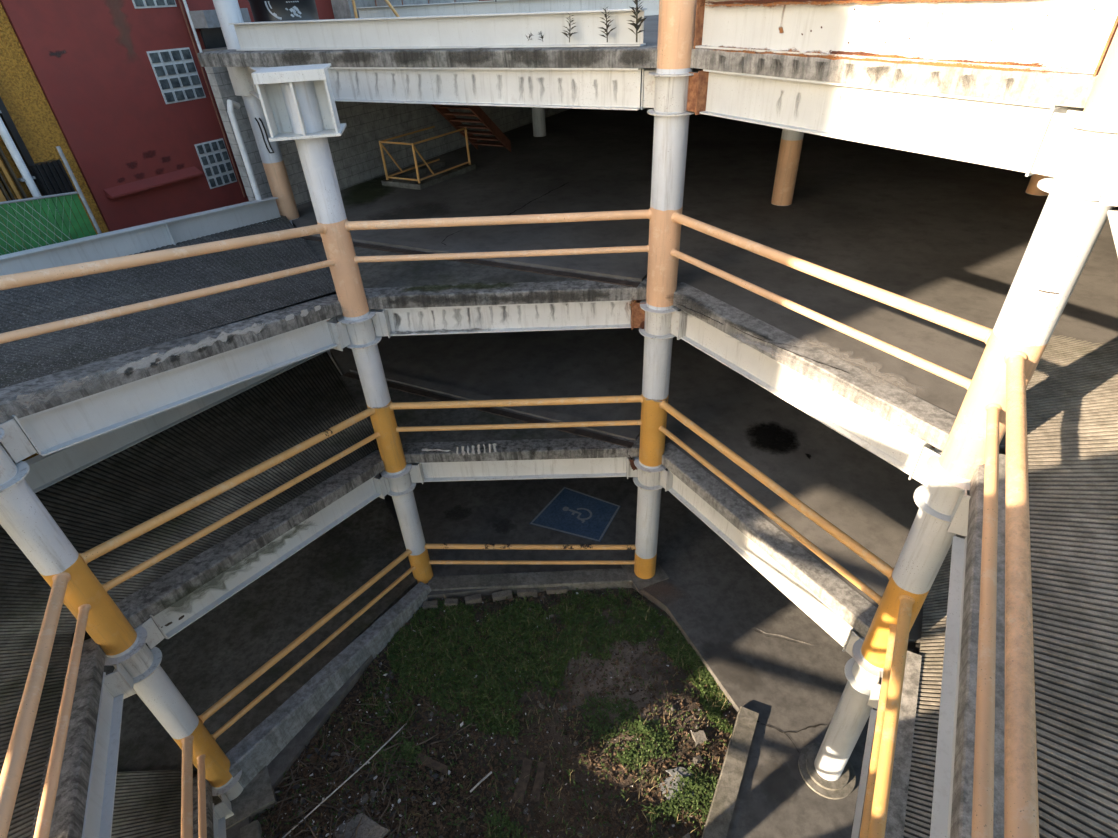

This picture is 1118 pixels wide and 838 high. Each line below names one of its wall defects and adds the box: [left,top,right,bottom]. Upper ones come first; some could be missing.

corrosion [702,0,1017,10]
water stain [283,50,309,65]
water stain [335,50,373,74]
water stain [394,50,427,63]
water stain [450,48,492,77]
water stain [513,49,546,82]
water stain [565,48,603,65]
water stain [621,50,645,64]
water stain [867,66,901,78]
corrosion [714,42,1063,74]